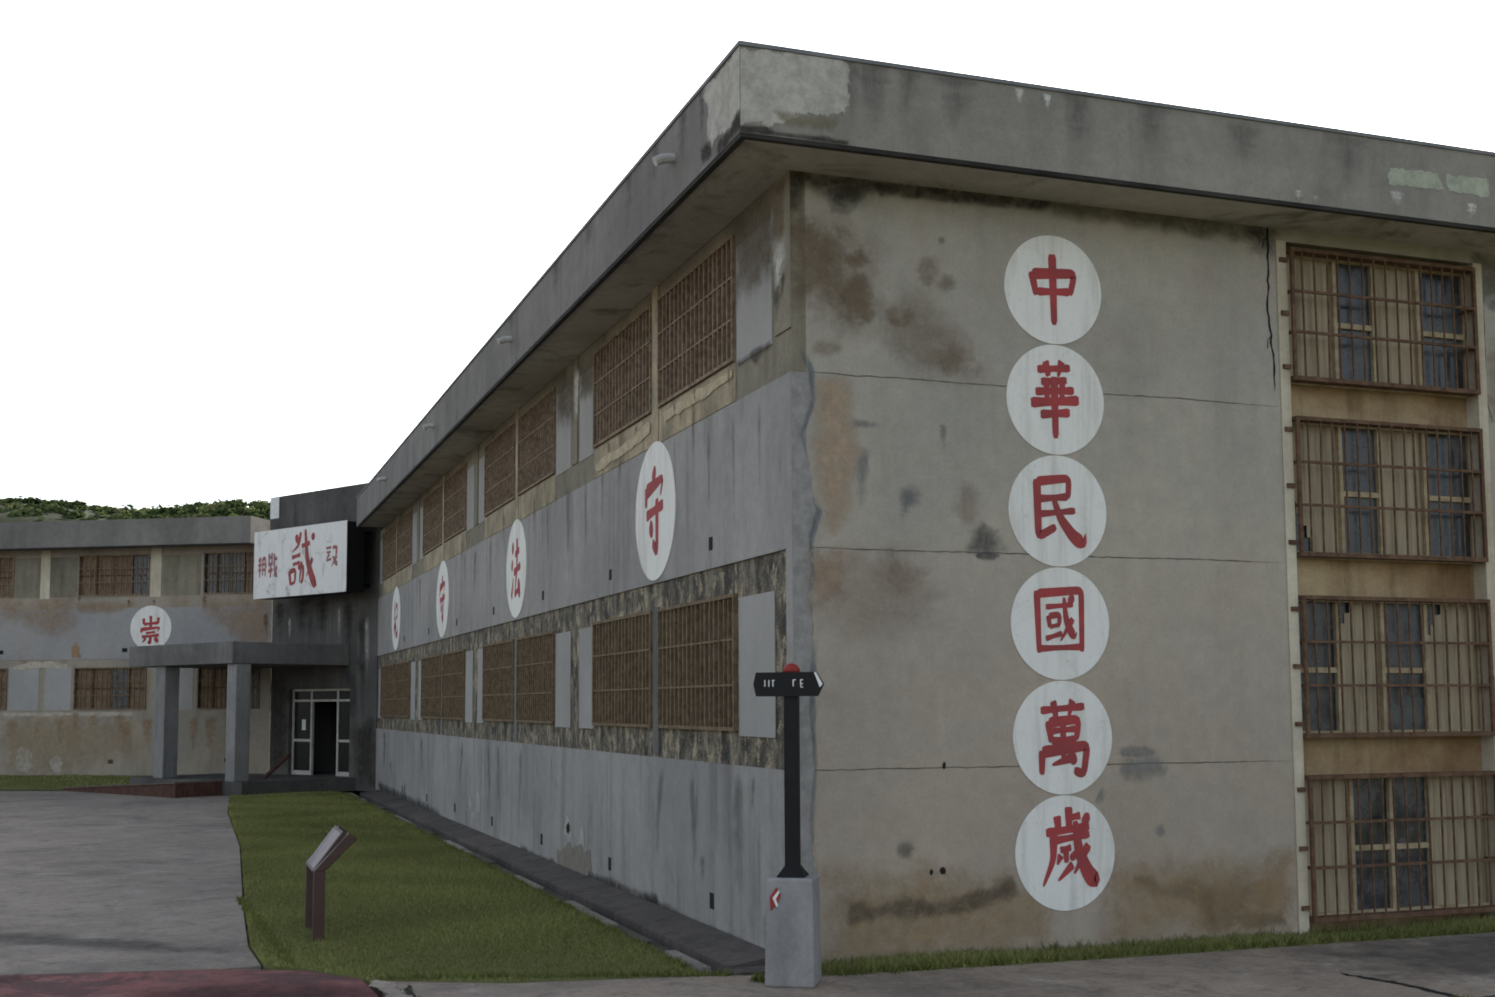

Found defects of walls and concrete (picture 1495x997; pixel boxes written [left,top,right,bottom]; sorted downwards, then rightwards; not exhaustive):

peeling [701,46,851,149]
damp [737,172,1048,322]
crack [1261,227,1275,386]